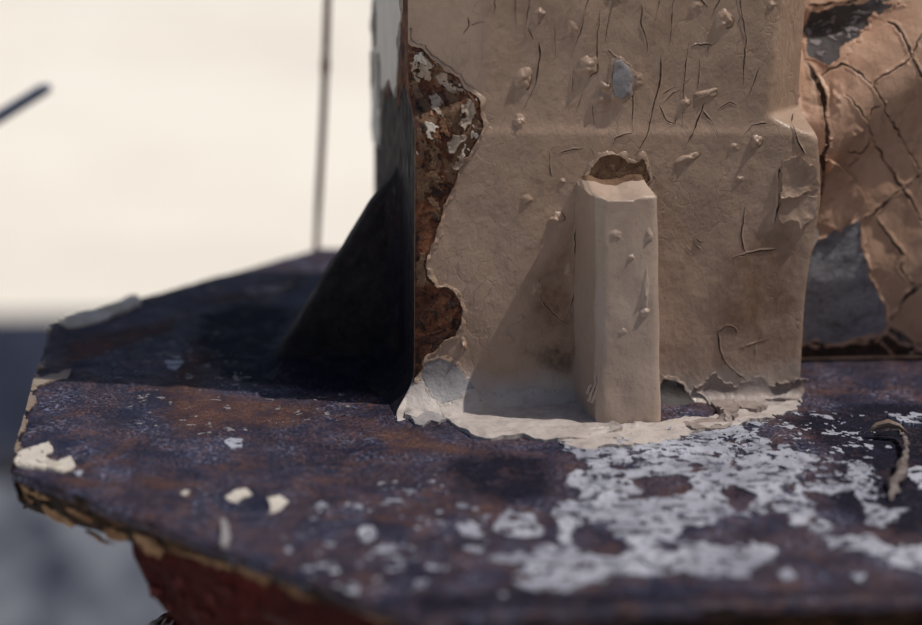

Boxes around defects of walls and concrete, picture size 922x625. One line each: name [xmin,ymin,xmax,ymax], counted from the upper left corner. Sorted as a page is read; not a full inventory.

crack [462,0,760,178]
crack [745,0,922,347]
crack [733,206,779,260]
peeling [46,295,141,333]
peeling [370,0,922,594]
peeling [14,363,83,477]
peeling [281,500,449,595]